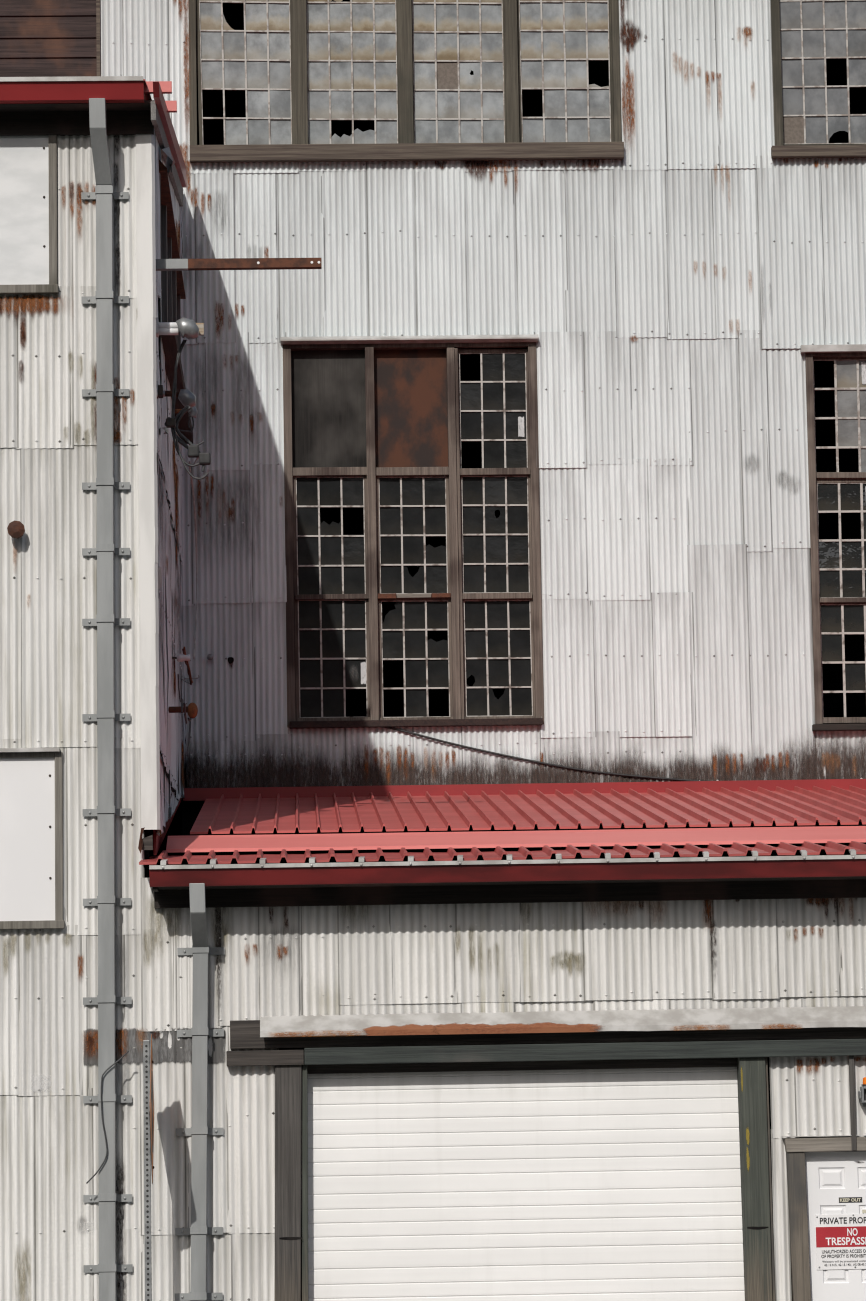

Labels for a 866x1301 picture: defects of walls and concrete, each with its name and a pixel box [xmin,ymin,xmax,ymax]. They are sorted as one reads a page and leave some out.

rust [174,0,189,116]
rust [620,0,641,138]
rust [179,145,211,212]
rust [0,295,57,345]
rust [170,443,179,561]
rust [365,746,414,781]
leakage [182,744,866,799]
rust [713,753,789,773]
rust [274,1022,600,1037]